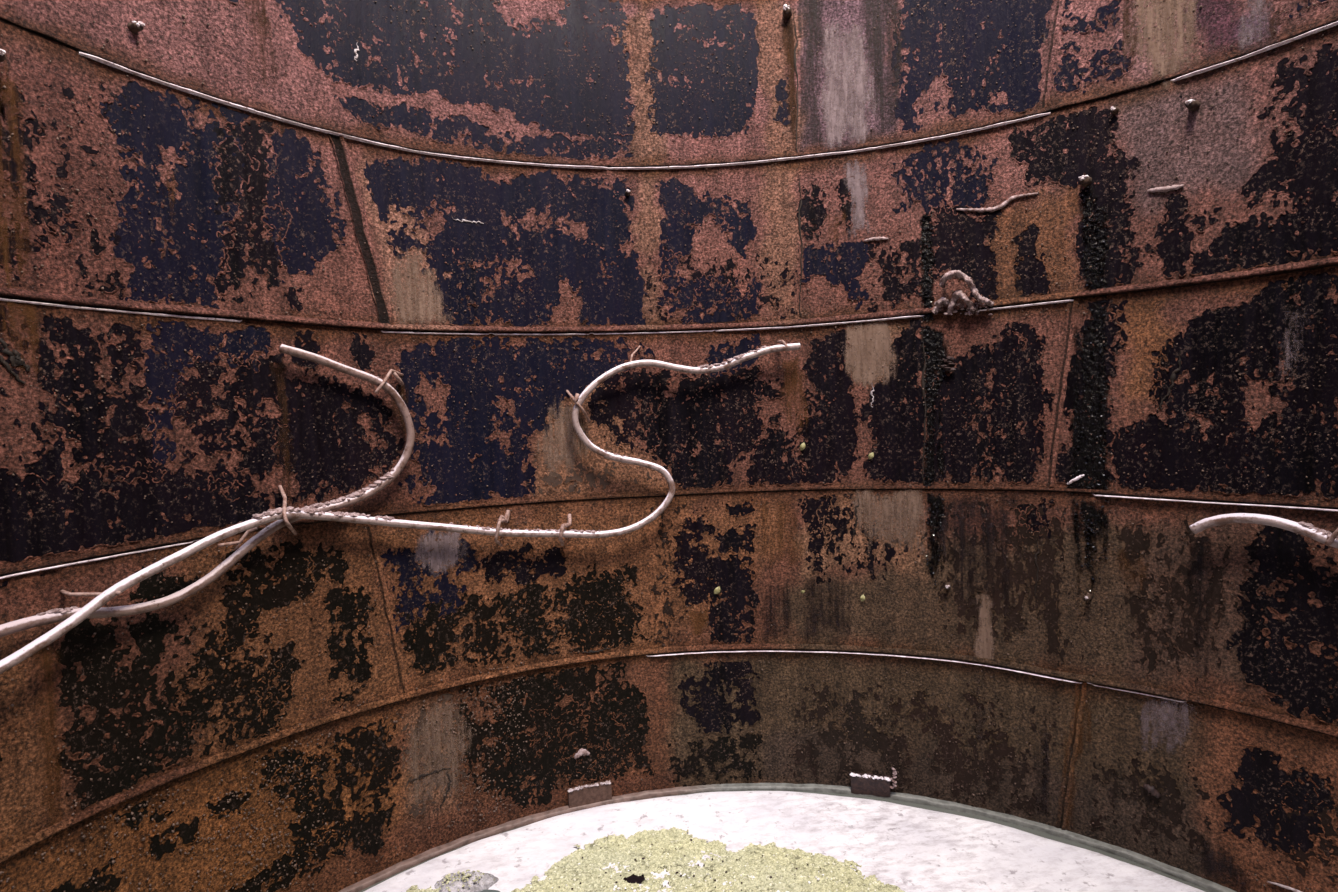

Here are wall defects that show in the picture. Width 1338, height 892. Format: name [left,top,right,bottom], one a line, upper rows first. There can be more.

leakage [798,0,901,149]
leakage [1126,0,1198,86]
leakage [847,163,869,233]
corrosion [956,193,1038,212]
corrosion [1147,184,1184,193]
peeling [0,0,1338,666]
corrosion [698,346,771,369]
corrosion [251,468,395,521]
peeling [47,538,404,892]
peeling [379,498,764,813]
peeling [1115,516,1338,725]
peeling [1087,745,1338,885]